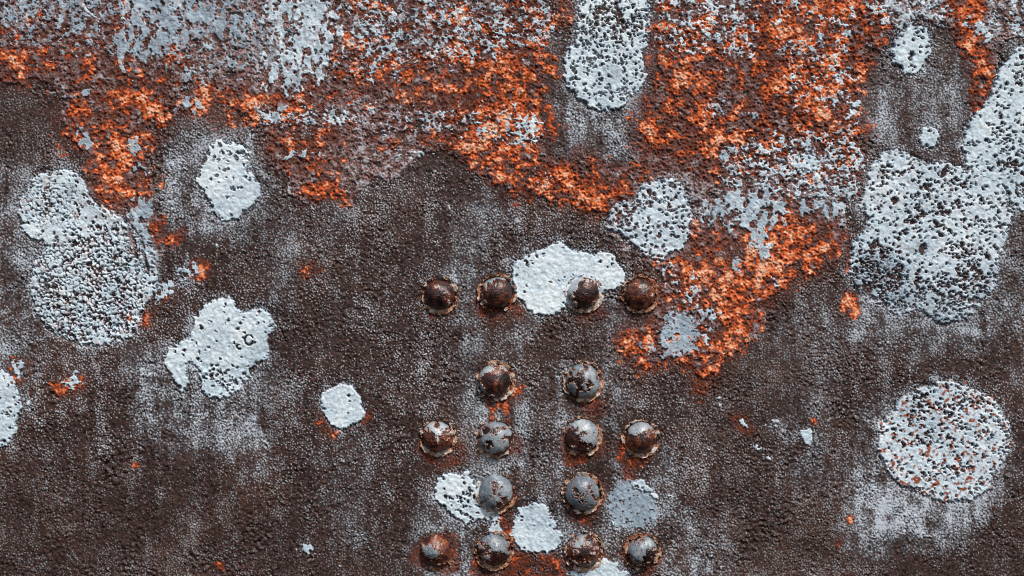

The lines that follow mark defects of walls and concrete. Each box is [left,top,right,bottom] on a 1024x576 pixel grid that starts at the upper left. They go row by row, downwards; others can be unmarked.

corrosion [942,0,996,112]
corrosion [0,0,892,403]
corrosion [484,379,526,423]
corrosion [561,435,653,481]
corrosion [427,512,571,576]